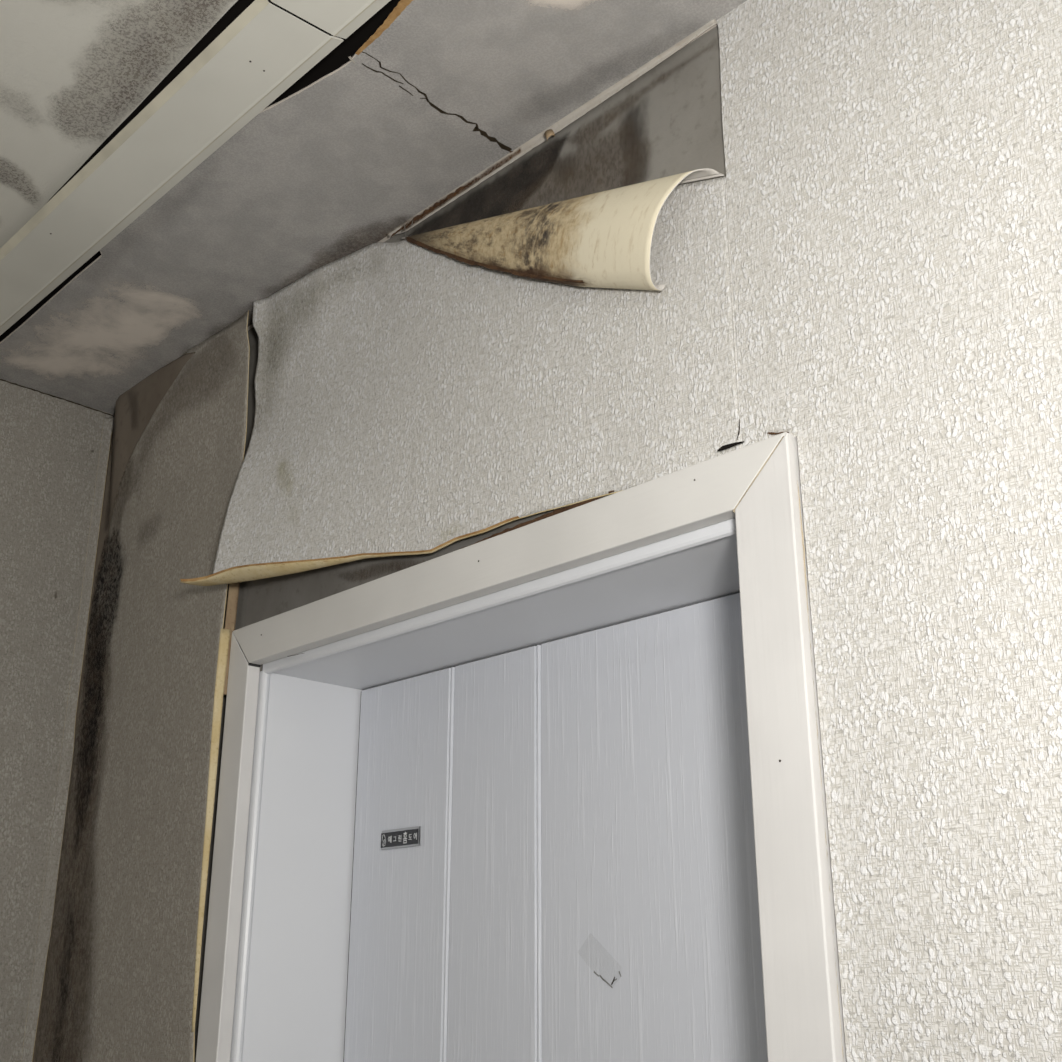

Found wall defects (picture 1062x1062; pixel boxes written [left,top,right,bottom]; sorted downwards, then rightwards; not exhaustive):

damp [0,0,747,427]
crack [362,52,513,153]
flaking render [385,25,726,243]
flaking render [244,505,570,627]
damp [35,531,123,1062]